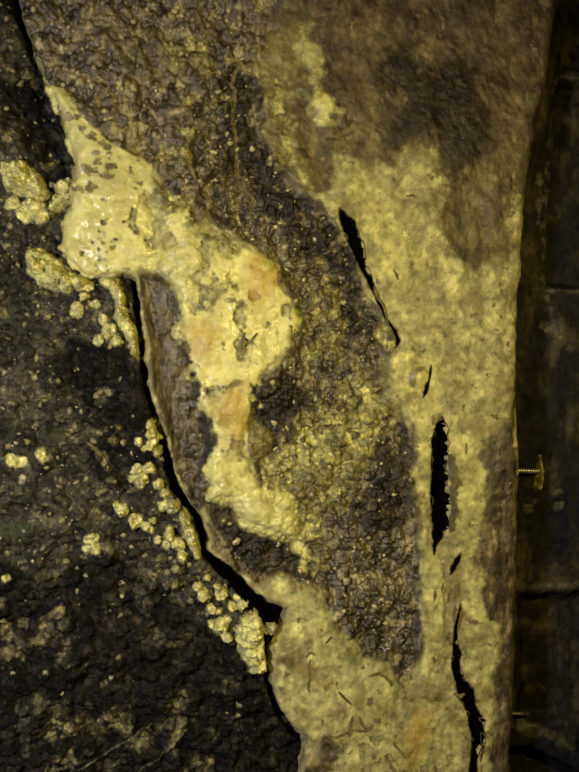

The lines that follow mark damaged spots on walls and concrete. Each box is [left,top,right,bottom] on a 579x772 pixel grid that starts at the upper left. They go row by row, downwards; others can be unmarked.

leakage [148,30,217,75]
spalling [0,218,46,270]
crack [133,281,152,403]
spalling [20,0,391,436]
leakage [0,62,471,772]
crack [339,208,401,347]
leakage [214,0,555,366]
crack [422,365,432,397]
spalling [142,546,201,581]
crack [159,439,265,619]
spalling [207,392,424,683]
crack [428,418,487,772]